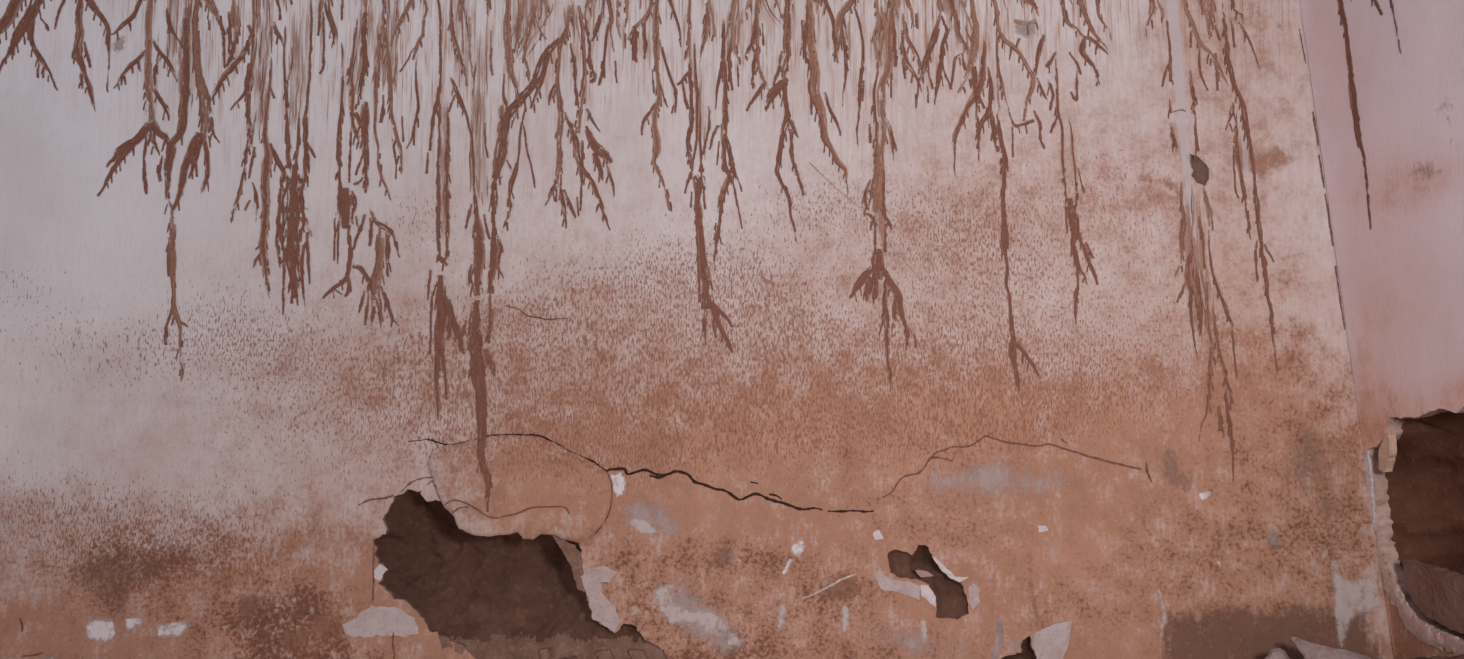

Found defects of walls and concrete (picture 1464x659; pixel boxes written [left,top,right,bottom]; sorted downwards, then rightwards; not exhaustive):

leakage [0,0,1112,512]
leakage [1174,181,1239,482]
leakage [1145,0,1278,375]
leakage [1337,0,1371,229]
spalling [342,489,668,659]
peeling [611,473,678,534]
peeling [655,584,741,652]
crack [358,434,1152,535]
spalling [873,530,980,652]
spalling [991,619,1072,659]
leakage [1162,606,1379,659]
spalling [1333,406,1464,656]